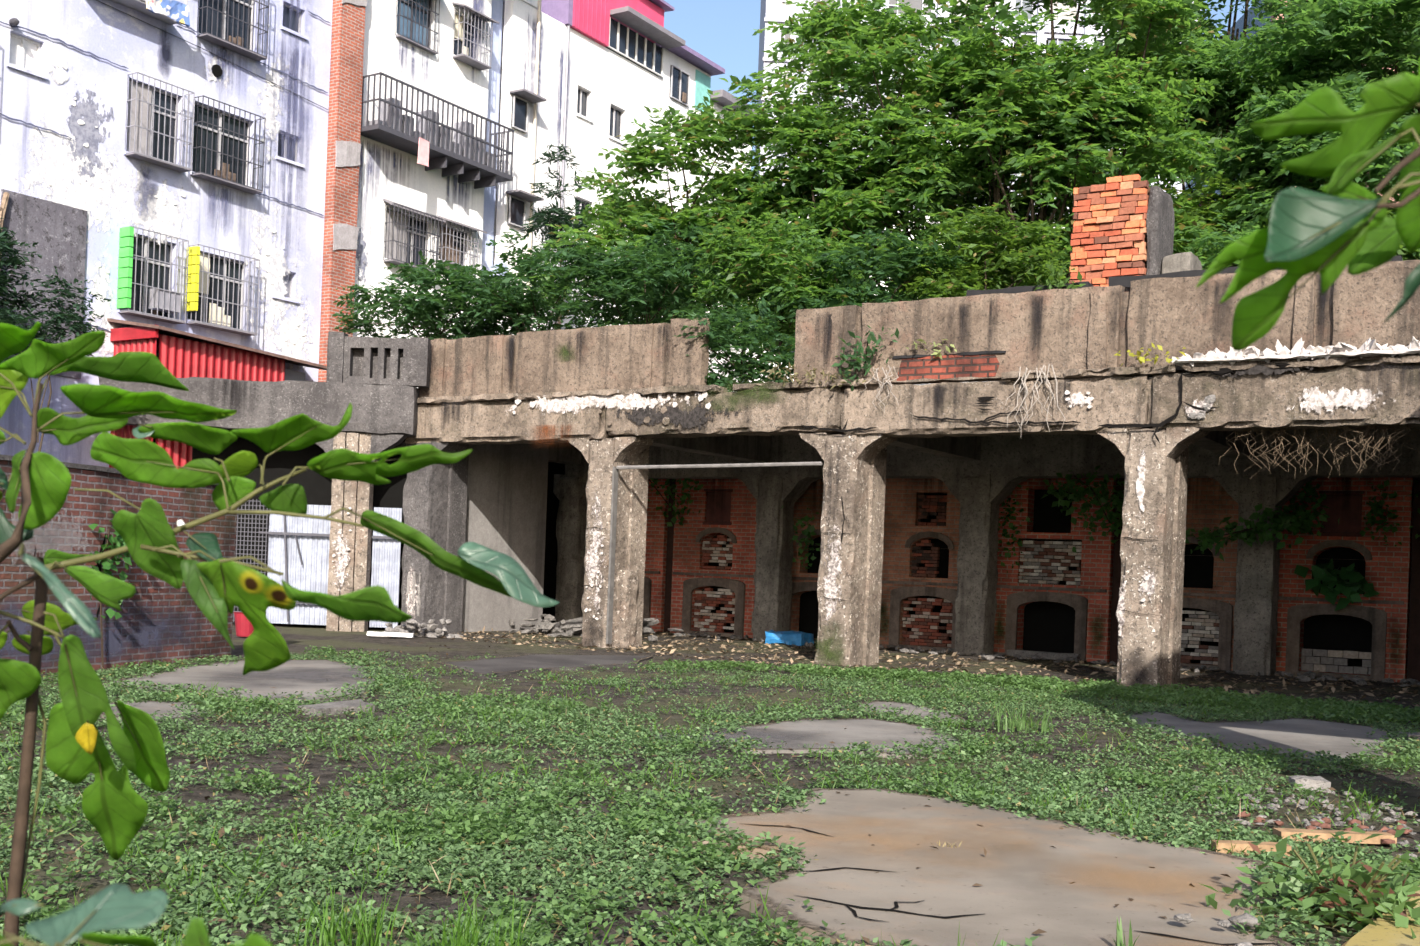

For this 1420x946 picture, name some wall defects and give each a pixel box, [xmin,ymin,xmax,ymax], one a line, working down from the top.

leakage [160,44,171,70]
leakage [281,49,305,172]
leakage [360,146,402,191]
leakage [447,175,468,199]
peeling [14,89,191,357]
peeling [1172,336,1420,378]
peeling [506,390,749,429]
spalling [1183,394,1216,420]